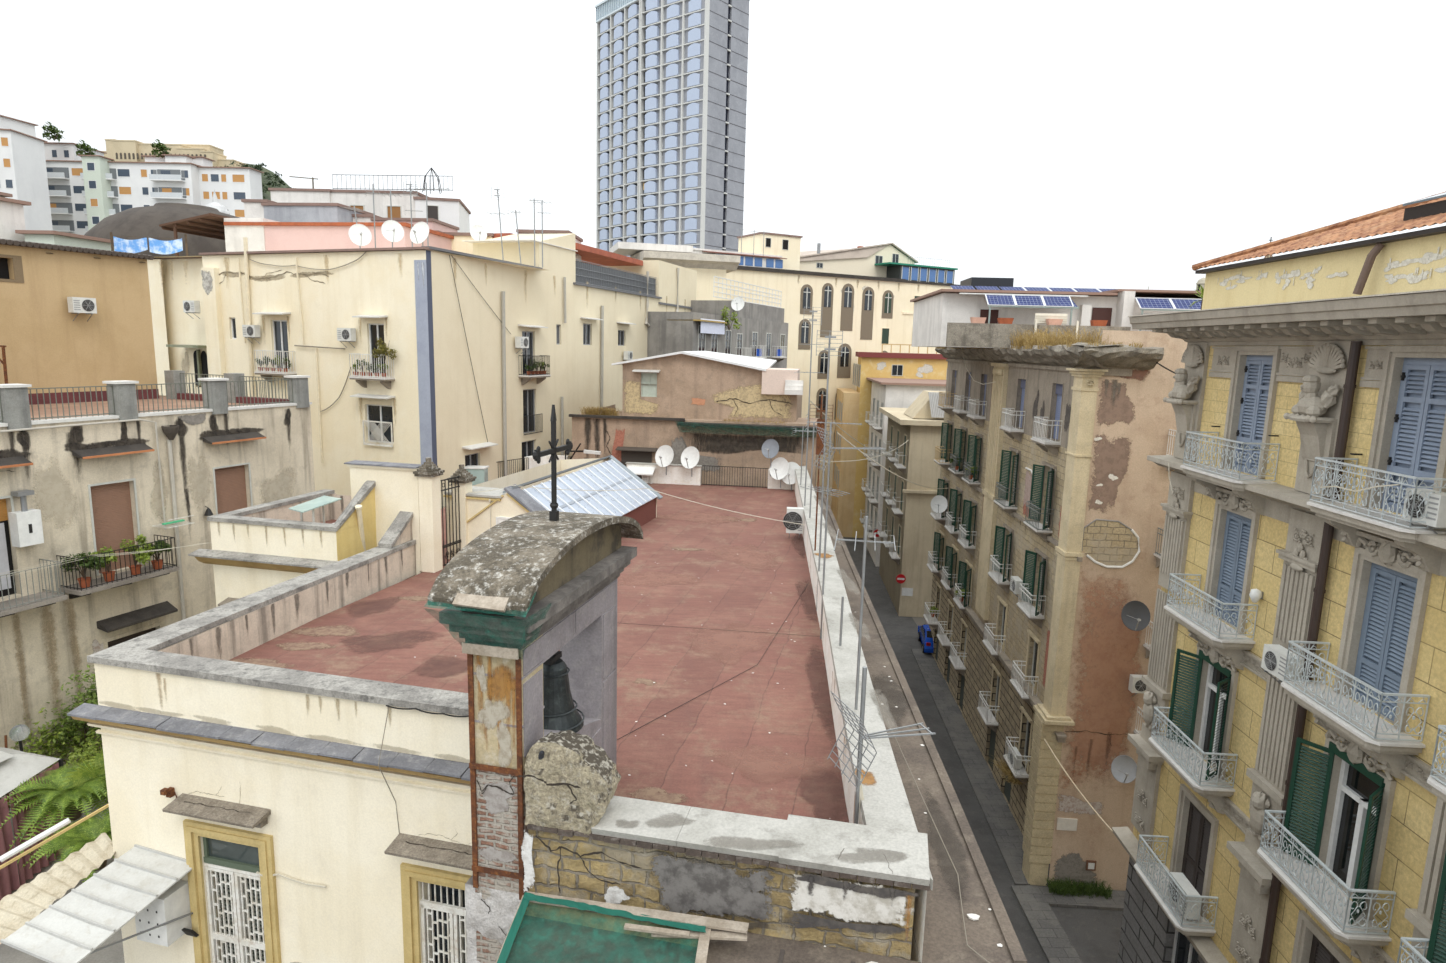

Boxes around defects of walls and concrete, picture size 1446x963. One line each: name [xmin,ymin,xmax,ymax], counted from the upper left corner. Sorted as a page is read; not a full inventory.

leakage [65,421,148,466]
flaking render [1082,381,1141,568]
leakage [350,597,398,616]
leakage [345,631,431,653]
leakage [416,658,467,677]
flaking render [476,665,515,815]
spalling [478,830,749,963]
peeling [789,874,915,926]